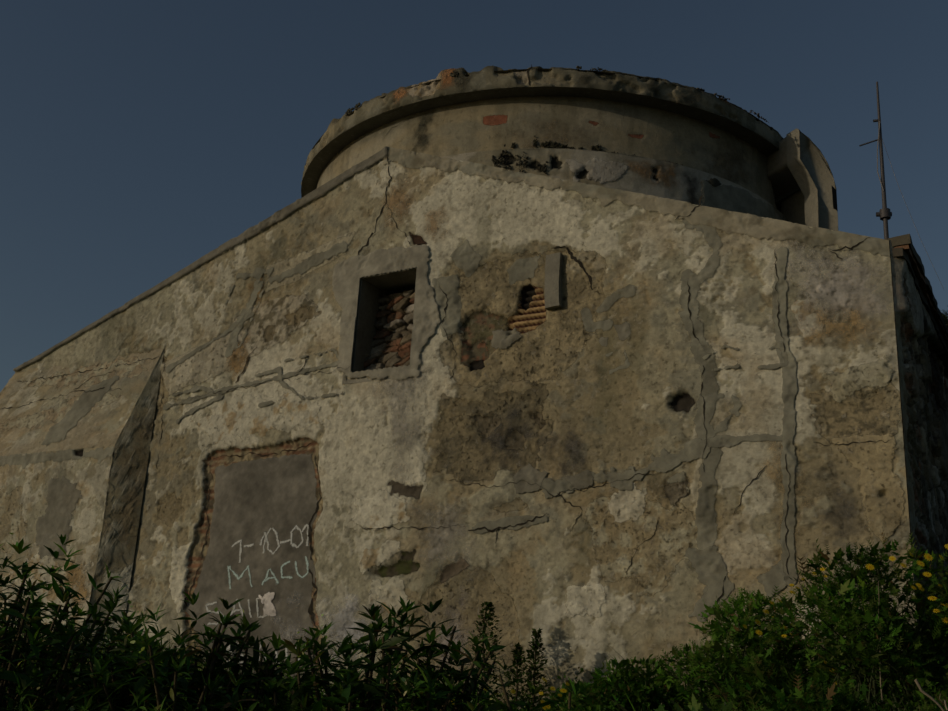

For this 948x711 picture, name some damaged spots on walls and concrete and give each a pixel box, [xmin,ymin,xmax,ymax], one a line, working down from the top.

crack [358,114,427,255]
crack [687,283,700,343]
crack [774,250,785,351]
peeling [351,246,606,671]
crack [699,366,707,469]
crack [734,454,790,574]